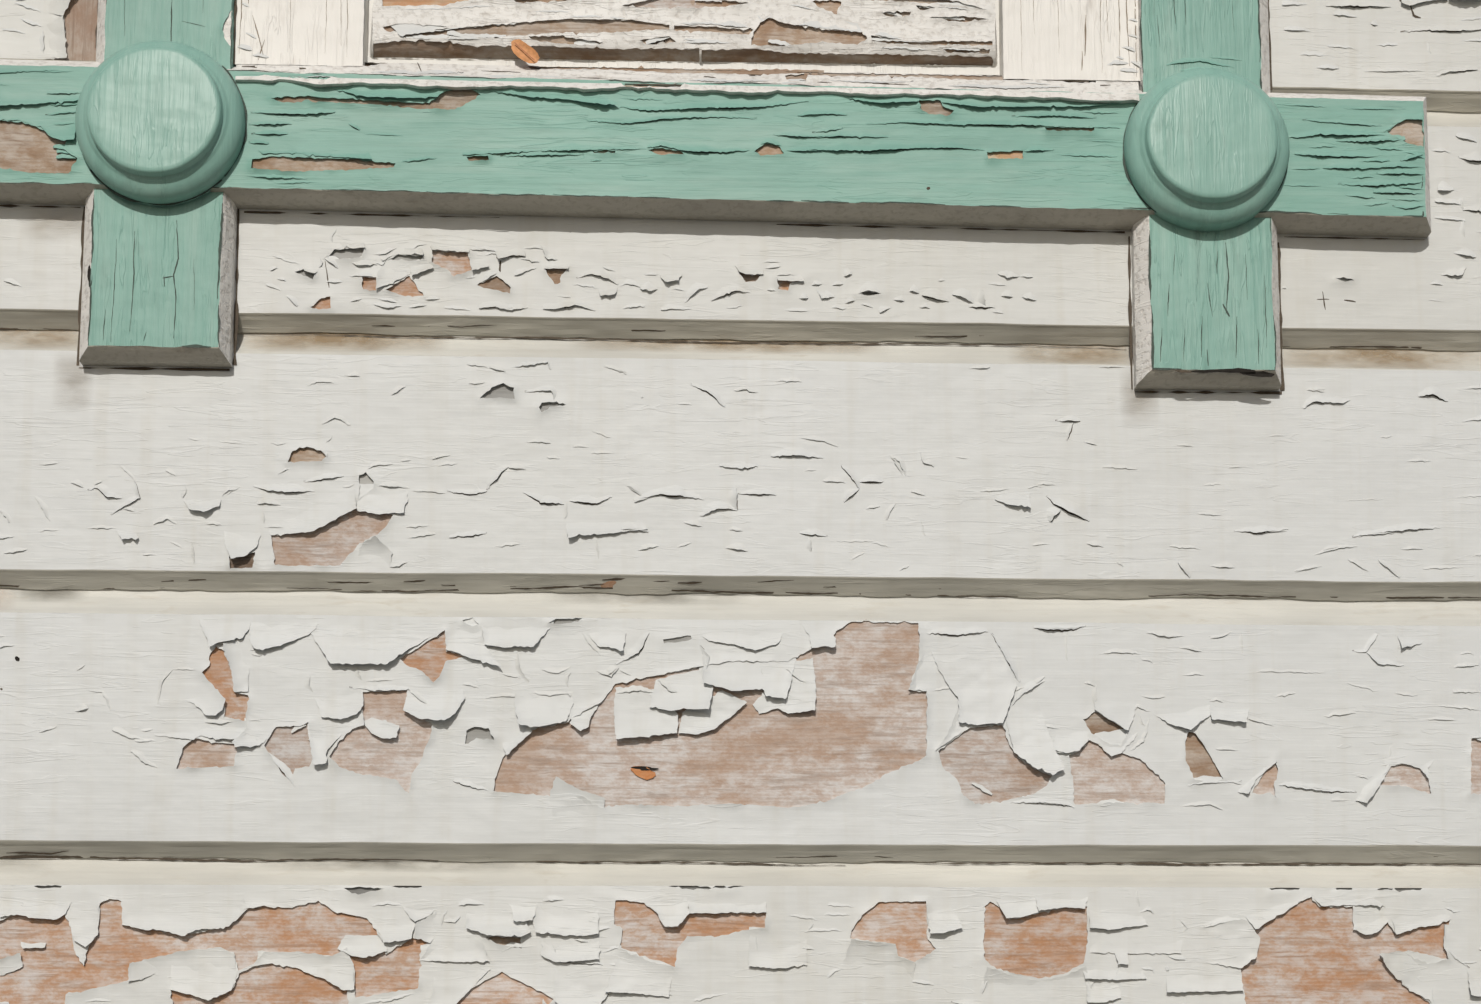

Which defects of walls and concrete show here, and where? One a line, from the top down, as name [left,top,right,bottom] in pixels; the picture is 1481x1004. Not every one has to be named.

peeling [47,0,98,61]
peeling [365,0,1096,87]
peeling [0,91,81,174]
peeling [274,78,618,110]
peeling [296,242,525,297]
peeling [224,473,408,568]
peeling [154,615,626,793]
peeling [465,619,1165,819]
peeling [1156,705,1250,778]
peeling [0,885,807,1004]
peeling [843,902,963,978]
peeling [983,888,1451,1004]